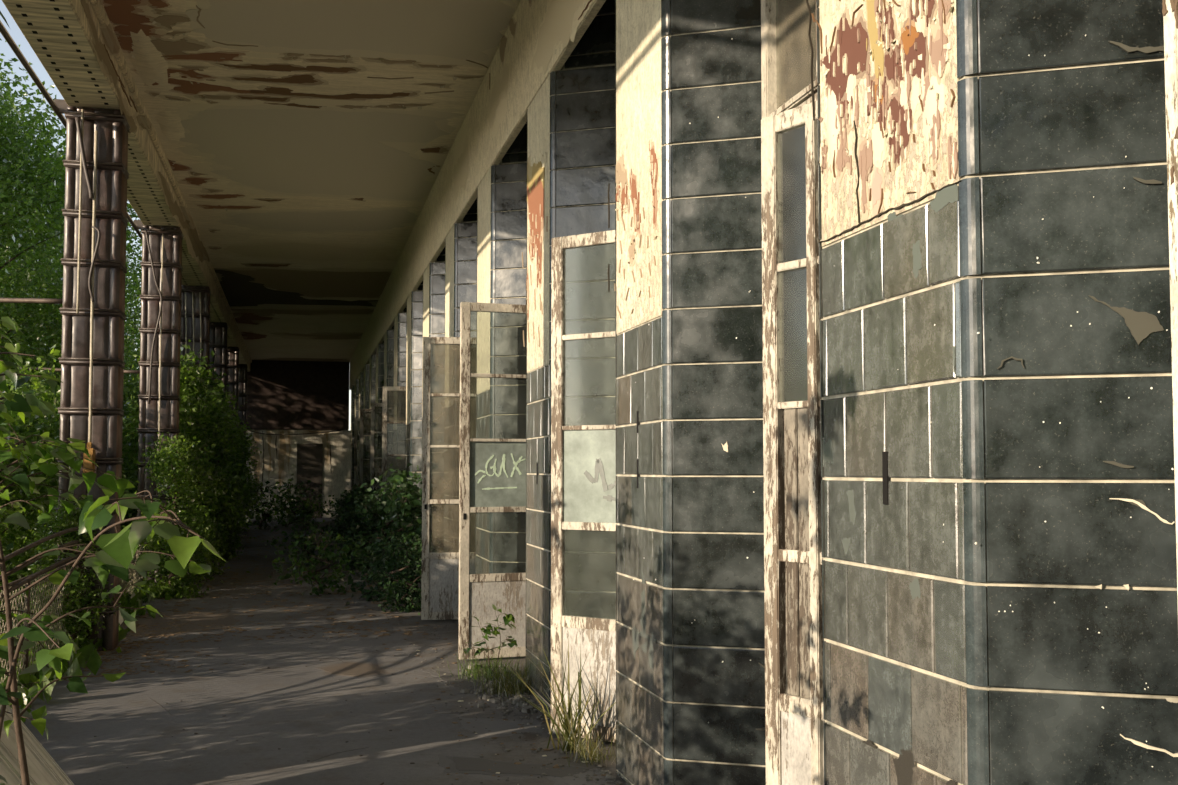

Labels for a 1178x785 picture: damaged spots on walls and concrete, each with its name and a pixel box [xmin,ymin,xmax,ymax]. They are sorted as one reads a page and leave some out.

peeling [100,0,267,104]
corrosion [527,151,545,206]
peeling [818,0,959,222]
crack [819,89,962,243]